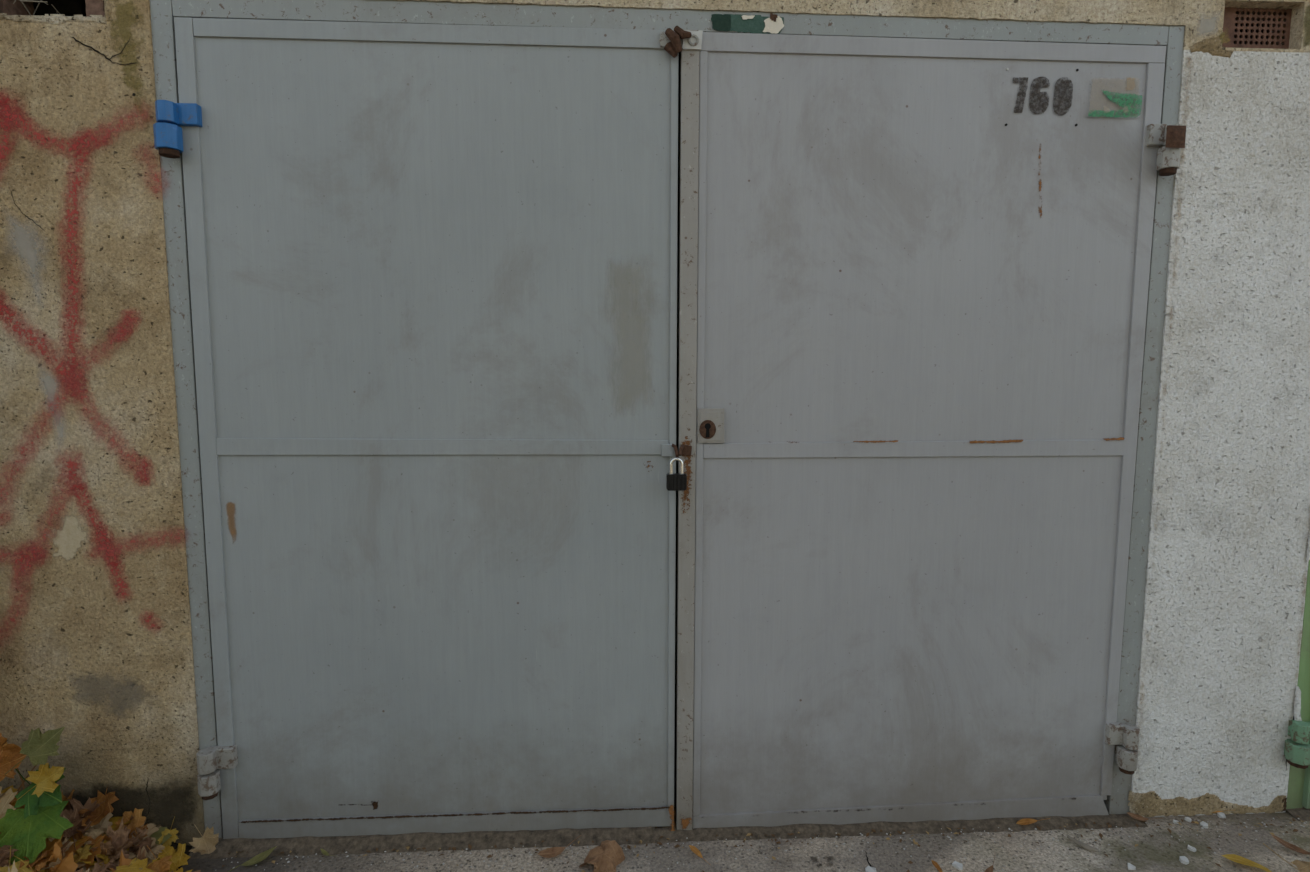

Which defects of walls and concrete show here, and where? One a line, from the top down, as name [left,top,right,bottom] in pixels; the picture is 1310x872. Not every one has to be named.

spalling [0,0,113,25]
corrosion [681,436,693,513]
peeling [1128,790,1287,817]